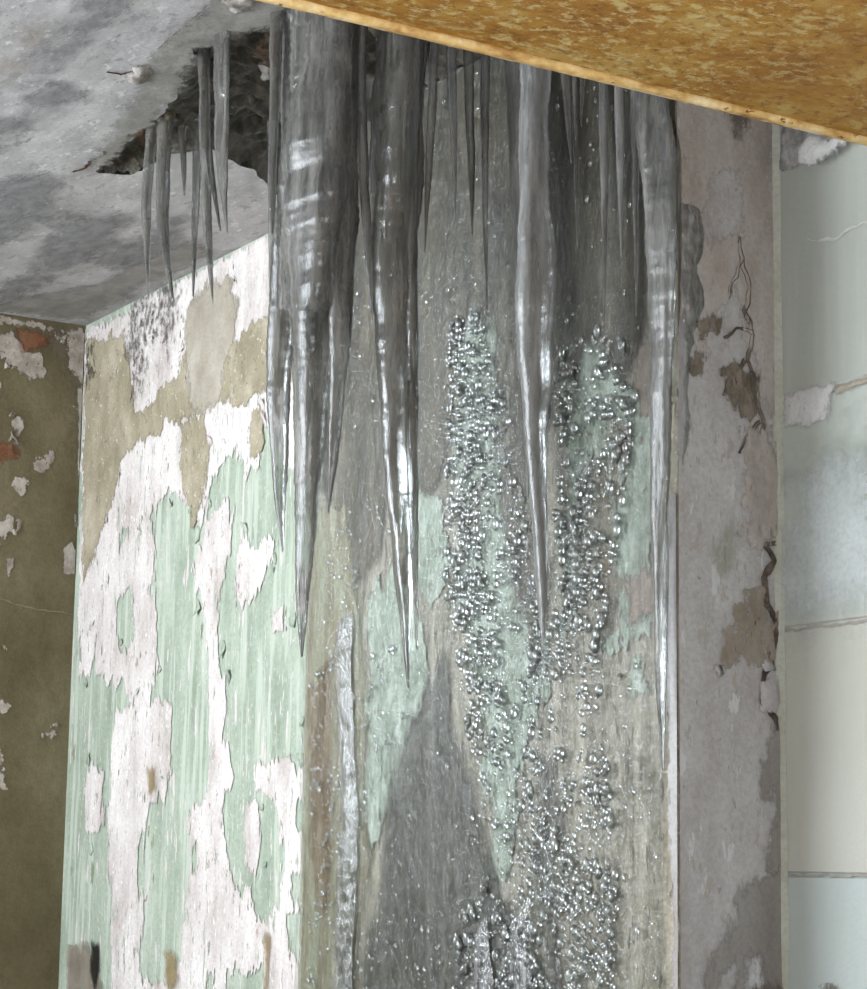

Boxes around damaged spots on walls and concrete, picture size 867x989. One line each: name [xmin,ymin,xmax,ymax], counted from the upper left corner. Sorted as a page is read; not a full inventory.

peeling [0,175,187,302]
spalling [96,129,157,175]
damp [89,0,290,176]
spalling [160,28,284,195]
damp [320,56,541,645]
damp [547,71,661,421]
crack [722,236,766,454]
flaking render [680,102,833,557]
flaking render [0,234,311,989]
flaking render [715,586,779,677]
crack [751,540,867,731]
damp [363,654,561,989]